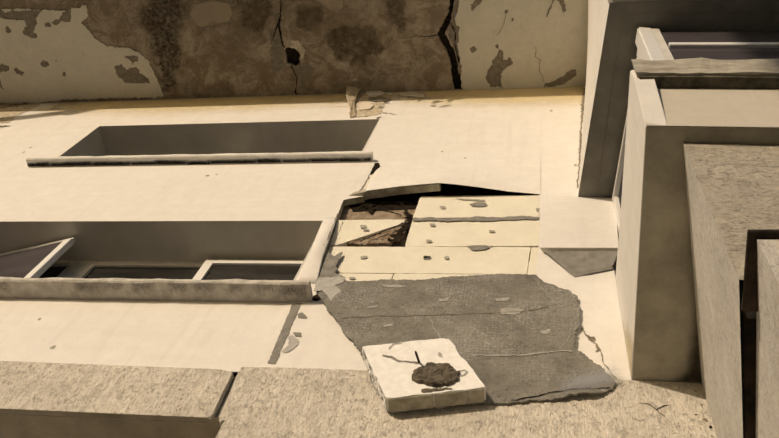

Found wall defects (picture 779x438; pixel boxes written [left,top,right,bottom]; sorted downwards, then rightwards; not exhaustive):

peeling [0,5,164,127]
water stain [58,94,346,109]
crack [270,0,315,95]
crack [401,0,463,90]
peeling [454,0,588,90]
peeling [282,332,302,353]